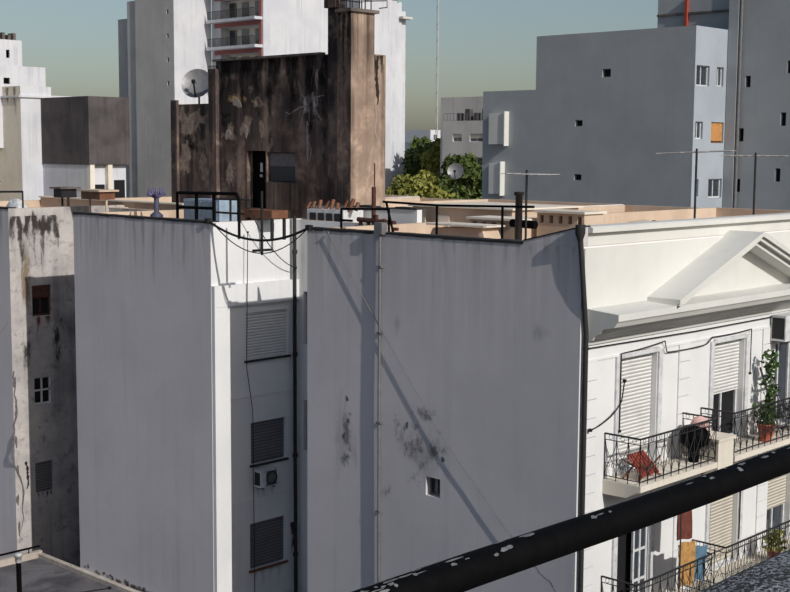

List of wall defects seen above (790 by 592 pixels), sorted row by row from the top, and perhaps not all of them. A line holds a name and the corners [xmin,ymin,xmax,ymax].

flaking render [179,106,209,191]
flaking render [221,95,267,143]
damp [219,55,328,160]
damp [9,212,59,300]
peeling [84,564,147,592]
peeling [351,565,427,592]